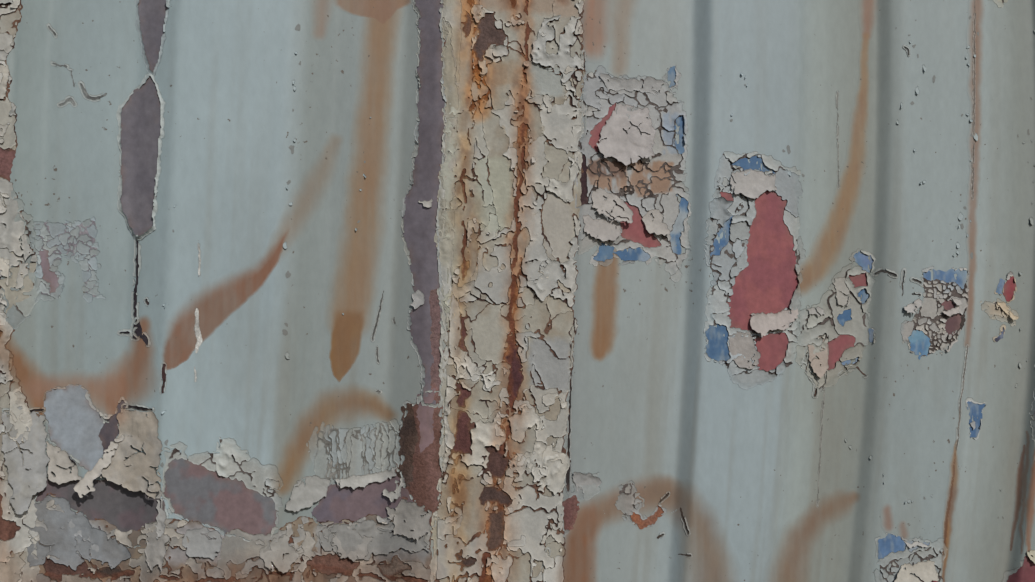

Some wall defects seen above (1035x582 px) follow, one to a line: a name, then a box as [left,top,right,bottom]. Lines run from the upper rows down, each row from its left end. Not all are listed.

corrosion [963,0,986,348]
peeling [0,0,692,582]
peeling [704,145,876,392]
peeling [901,206,1023,360]
peeling [965,397,986,440]
peeling [874,533,948,582]
corrosion [942,442,960,582]
peeling [1002,550,1035,582]